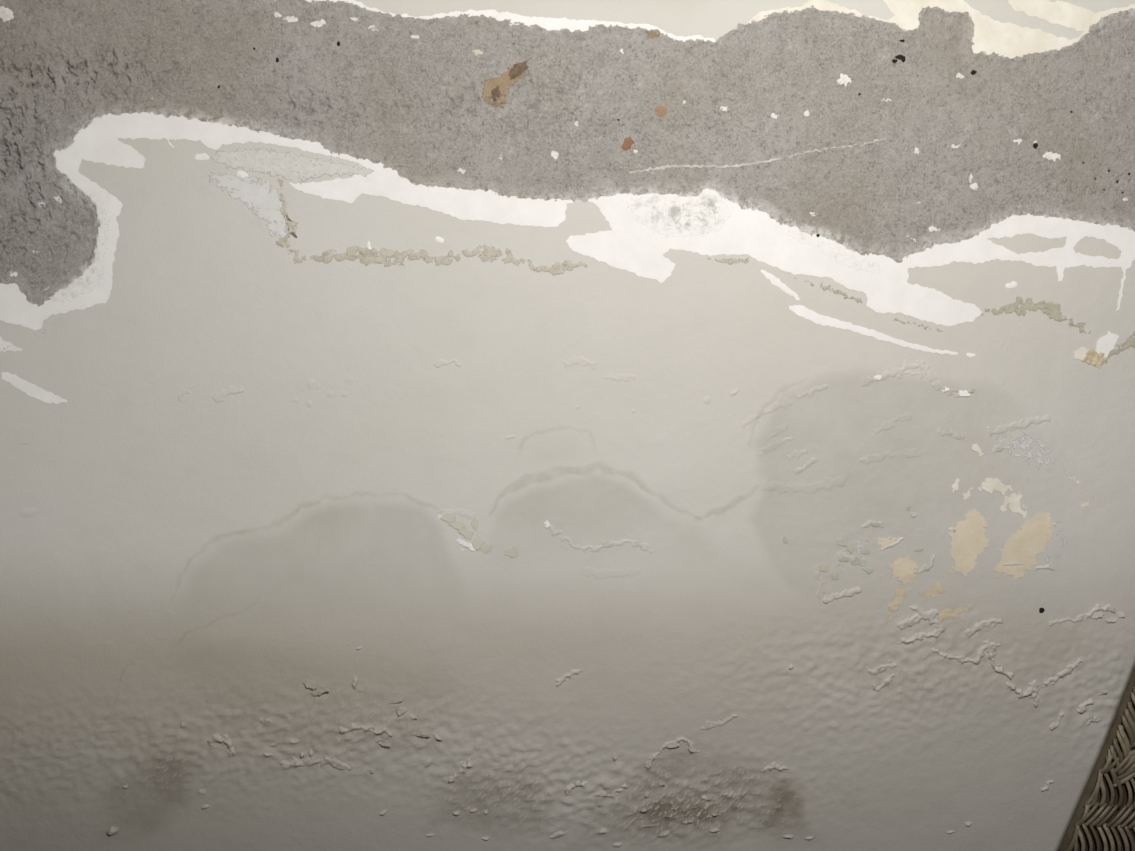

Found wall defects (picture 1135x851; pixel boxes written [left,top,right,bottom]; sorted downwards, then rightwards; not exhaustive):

rust [482,61,528,107]
flaking render [0,0,1135,398]
peeling [1,372,67,404]
peeling [812,477,1057,624]